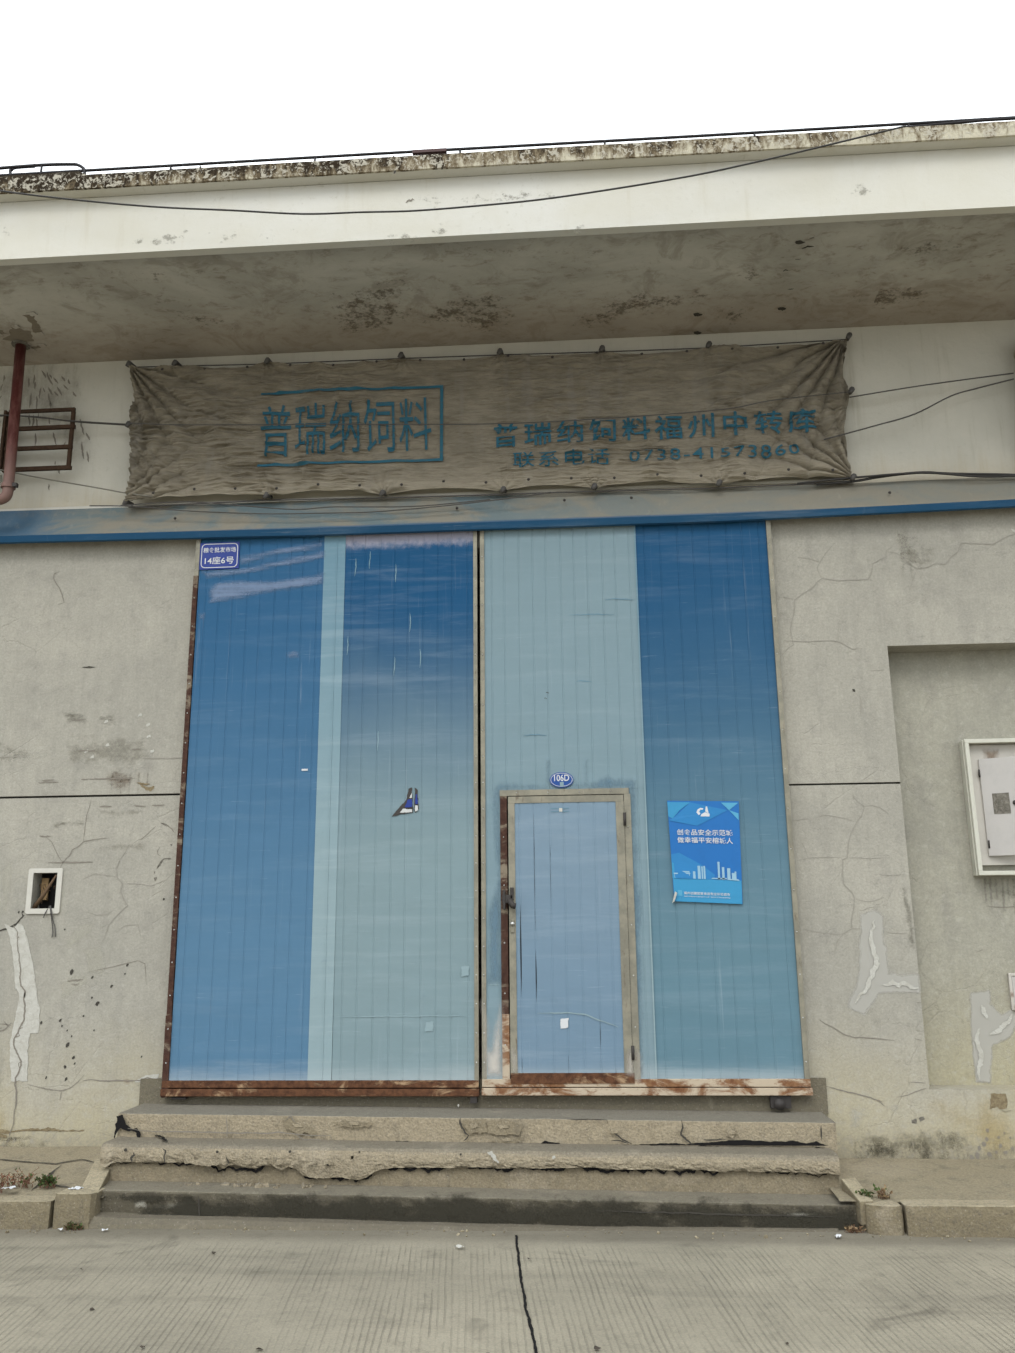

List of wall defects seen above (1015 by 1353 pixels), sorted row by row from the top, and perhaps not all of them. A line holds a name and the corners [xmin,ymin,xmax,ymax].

crack [781,534,1015,715]
crack [793,801,907,957]
crack [108,1116,726,1183]
crack [765,1171,827,1179]